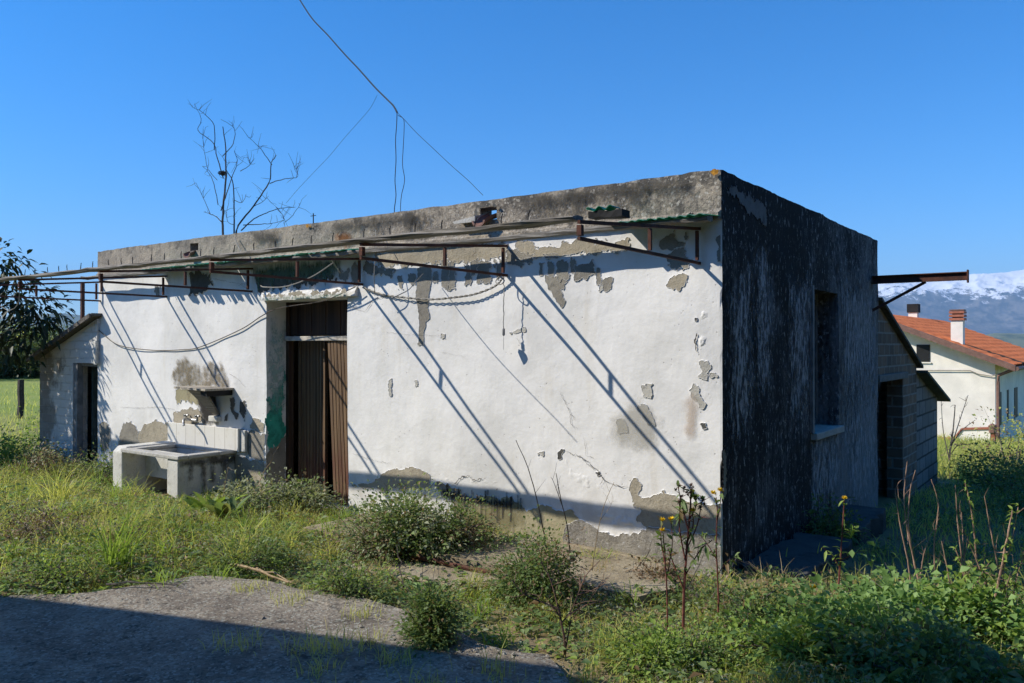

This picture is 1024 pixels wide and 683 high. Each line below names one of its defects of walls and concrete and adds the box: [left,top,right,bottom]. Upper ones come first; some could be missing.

peeling [255,237,631,346]
peeling [659,229,690,292]
peeling [99,389,203,452]
crack [563,399,629,489]
peeling [637,383,656,426]
peeling [689,360,718,430]
spalling [352,444,727,579]